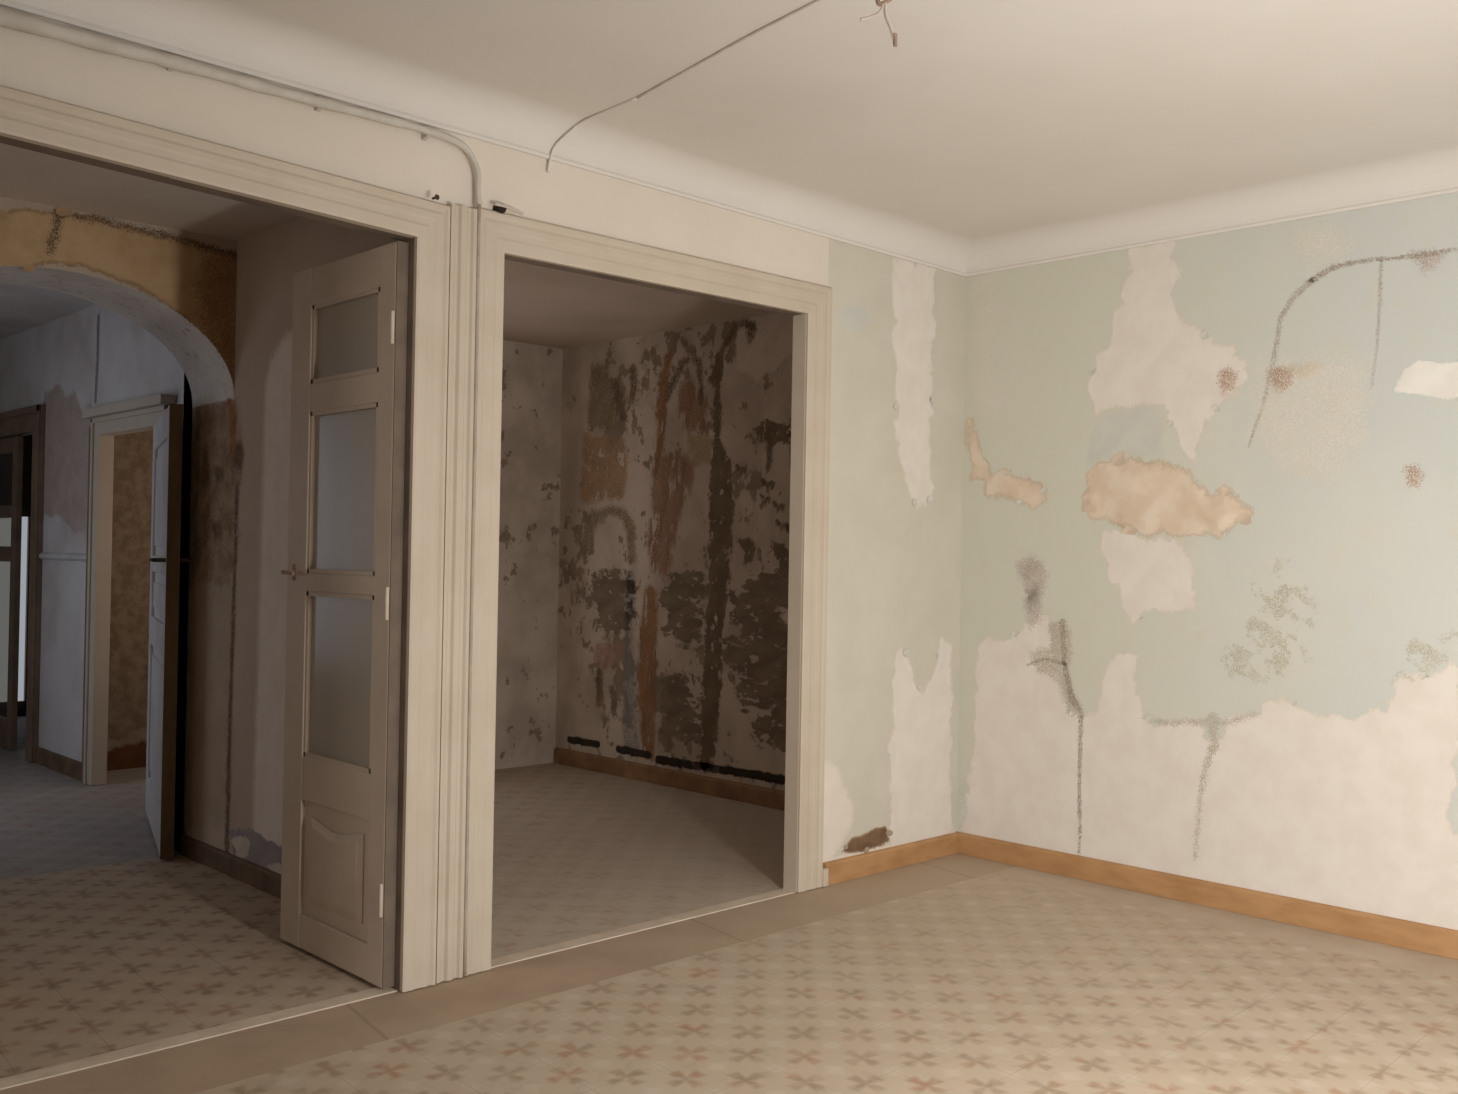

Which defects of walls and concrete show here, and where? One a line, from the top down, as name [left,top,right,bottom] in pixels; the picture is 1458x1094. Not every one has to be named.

flaking render [0,206,237,383]
peeling [891,258,937,510]
peeling [963,417,1049,510]
peeling [1086,241,1248,465]
peeling [1100,528,1198,624]
peeling [229,827,282,874]
crack [1027,619,1084,856]
peeling [823,612,1458,930]